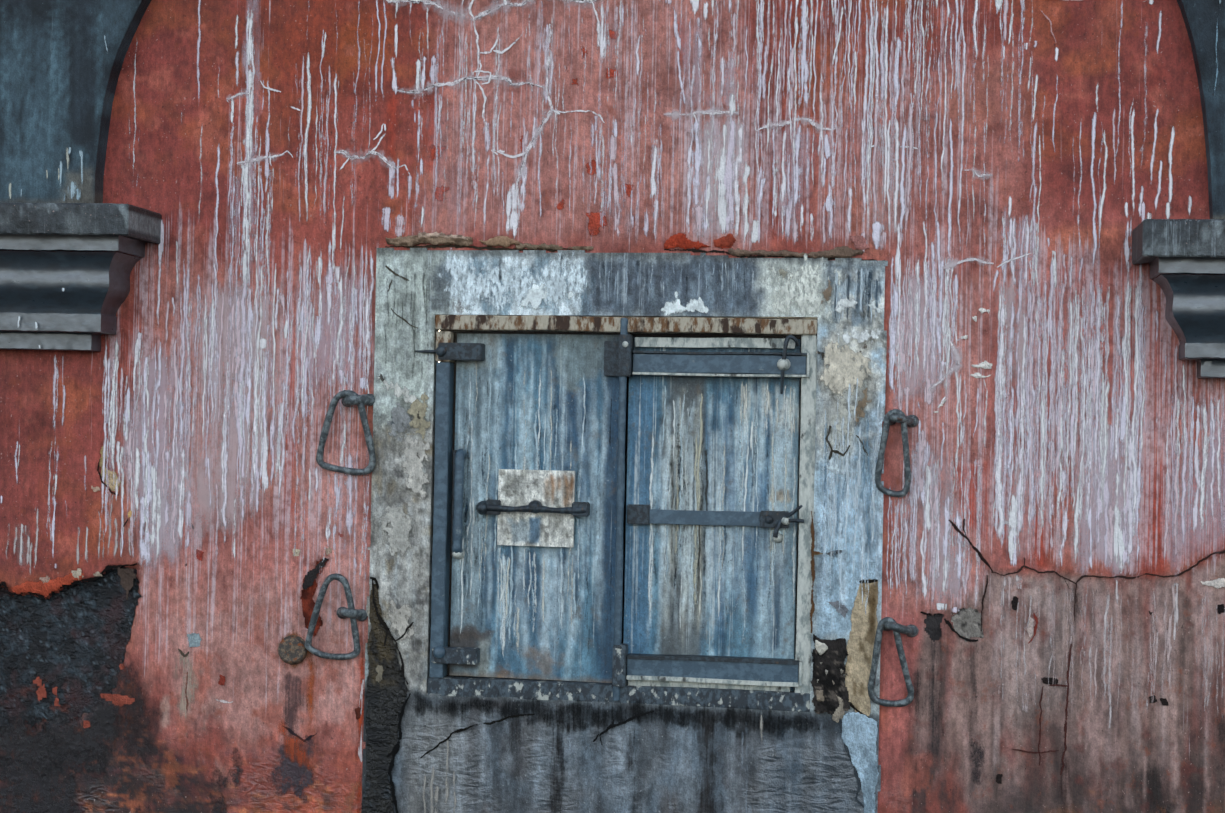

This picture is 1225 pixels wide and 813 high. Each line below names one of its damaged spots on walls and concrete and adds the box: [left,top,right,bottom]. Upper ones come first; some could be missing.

crack [335,124,410,174]
crack [386,0,604,191]
crack [667,109,835,130]
peeling [377,374,430,500]
peeling [971,361,992,378]
flaking render [0,563,162,779]
rust [355,652,364,762]
flaking render [361,577,415,813]
crack [372,579,535,813]
leakage [415,693,820,813]
peeling [811,579,879,813]
crack [948,519,1225,775]